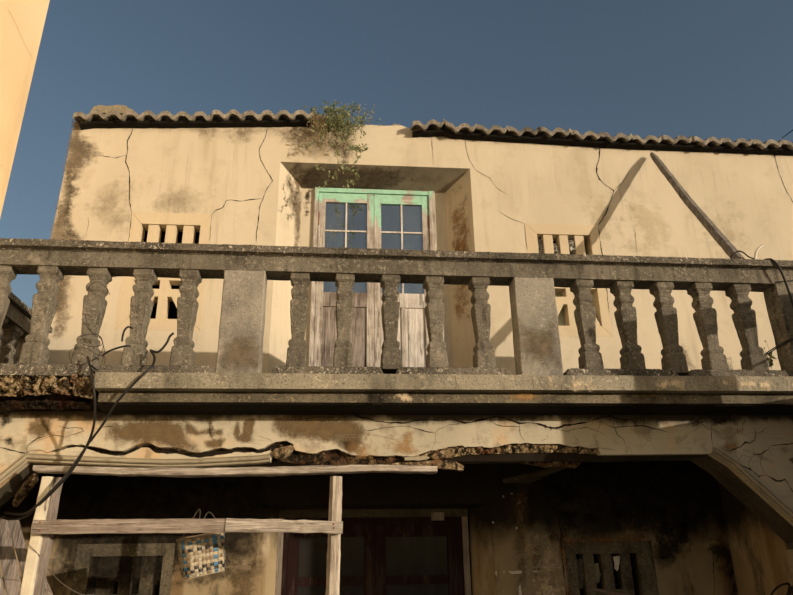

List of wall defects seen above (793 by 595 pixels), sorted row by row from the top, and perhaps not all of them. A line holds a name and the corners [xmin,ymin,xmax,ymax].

damp [51,121,96,240]
crack [100,128,133,241]
crack [210,131,273,239]
corrosion [452,204,468,251]
crack [596,148,629,308]
crack [1,426,113,453]
damp [234,419,255,442]
damp [274,416,364,452]
spalling [270,443,599,484]
crack [355,415,666,450]
crack [688,420,793,492]